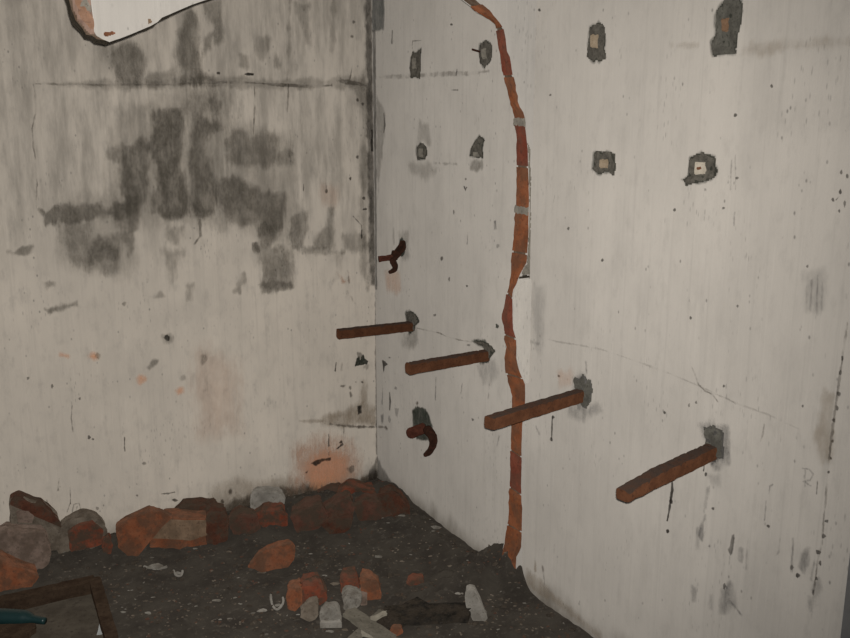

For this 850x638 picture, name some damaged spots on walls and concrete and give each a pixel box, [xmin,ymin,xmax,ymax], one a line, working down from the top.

spalling [72,0,94,34]
damp [153,110,212,218]
flaking render [471,4,531,408]
rust [336,321,413,339]
rust [405,349,490,375]
rust [484,389,584,430]
flaking render [499,421,523,569]
rust [616,443,717,502]